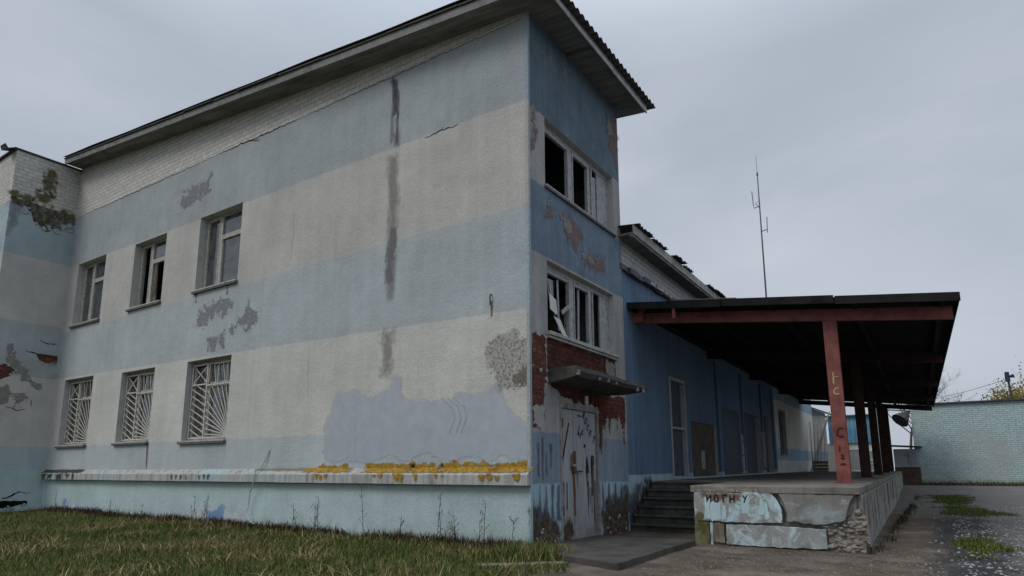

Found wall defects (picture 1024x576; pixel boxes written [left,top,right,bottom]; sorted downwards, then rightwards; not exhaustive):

crack [82,19,518,216]
water stain [391,78,399,143]
flaking render [10,196,75,234]
peeling [179,172,213,214]
water stain [385,229,397,282]
peeling [547,200,606,272]
peeling [196,297,262,352]
peeling [0,340,58,411]
flaking render [485,327,626,451]
water stain [601,478,652,535]
peeling [704,496,770,521]
spalling [801,507,876,554]